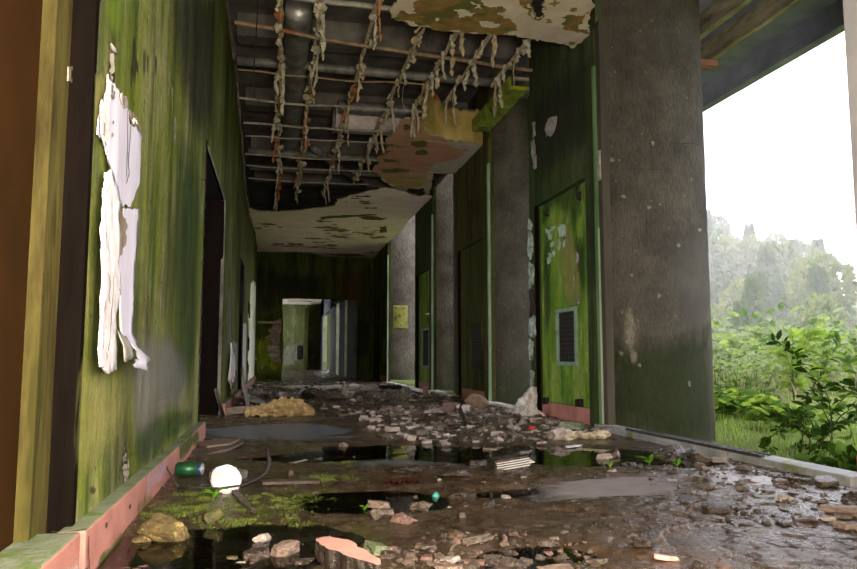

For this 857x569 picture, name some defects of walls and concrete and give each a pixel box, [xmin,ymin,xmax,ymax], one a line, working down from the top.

peeling [394,0,517,36]
peeling [546,8,590,45]
water stain [131,40,157,87]
water stain [174,0,215,130]
peeling [410,140,482,173]
peeling [531,116,557,169]
peeling [96,43,150,374]
peeling [271,195,387,249]
peeling [545,224,566,264]
peeling [221,229,282,392]
water stain [135,340,186,461]